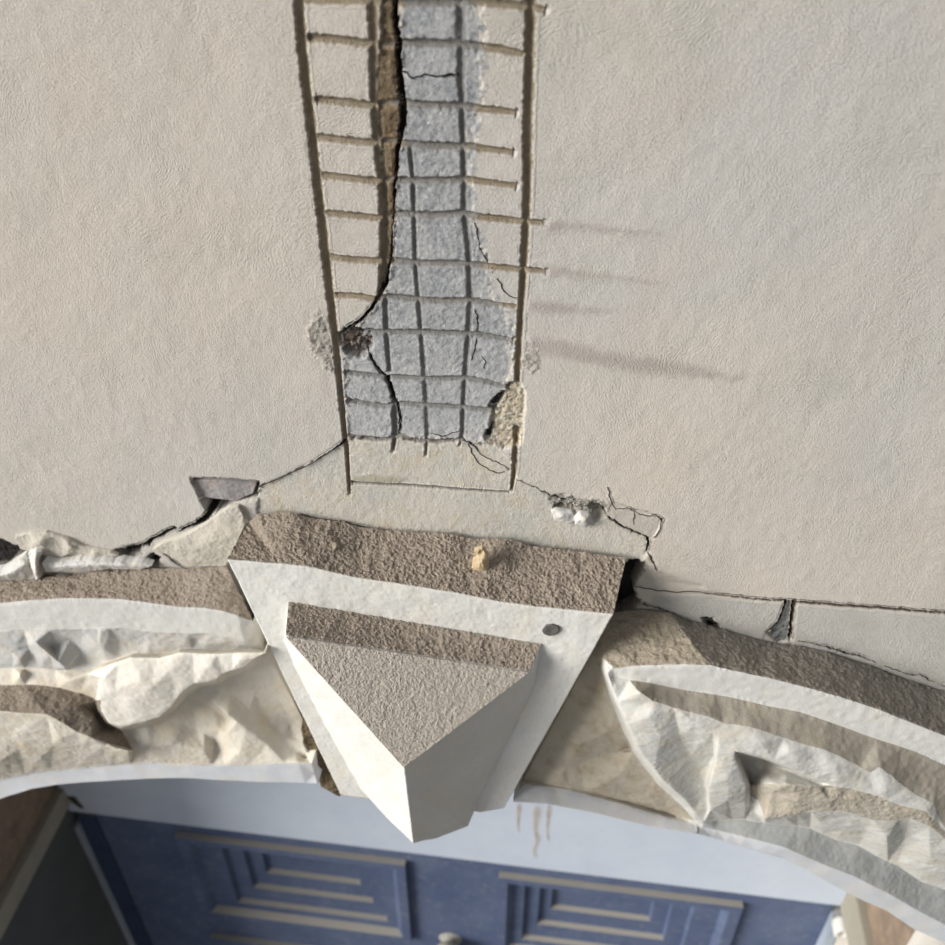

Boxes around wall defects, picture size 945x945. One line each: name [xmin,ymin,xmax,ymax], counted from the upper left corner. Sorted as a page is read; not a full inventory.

spalling [381,8,453,36]
spalling [380,50,455,98]
spalling [382,109,458,175]
crack [341,0,459,434]
spalling [389,186,482,210]
crack [258,438,347,488]
spalling [190,220,709,668]
crack [431,431,565,500]
peeling [0,530,161,583]
crack [115,498,224,569]
crack [300,512,368,528]
crack [602,487,945,688]